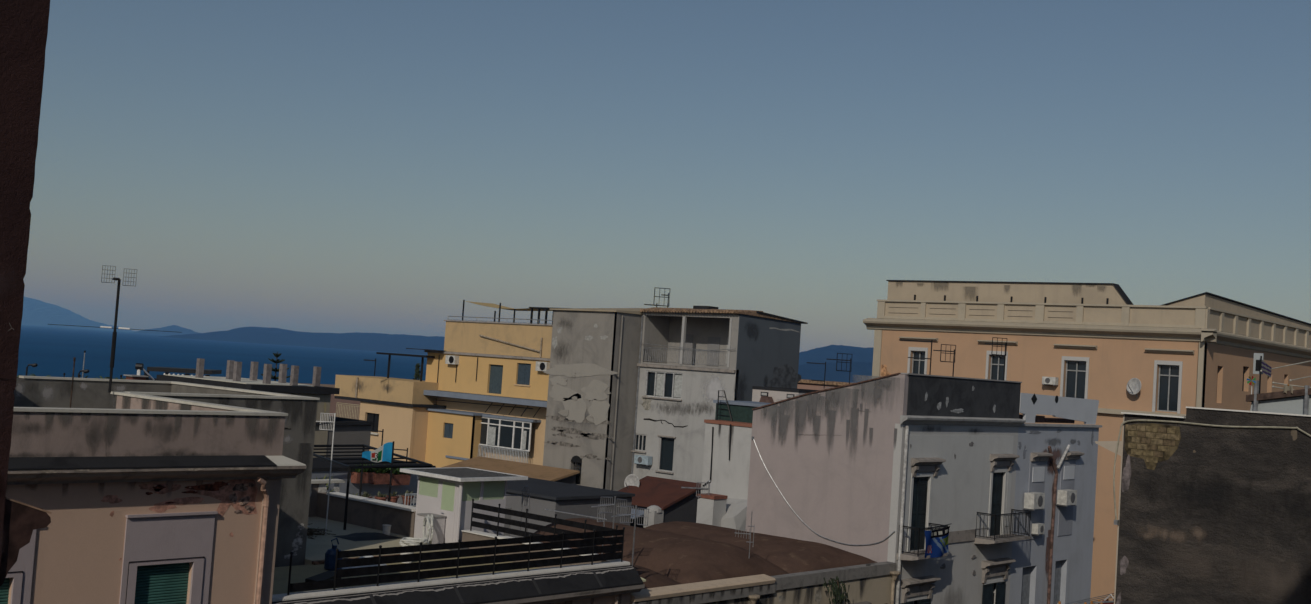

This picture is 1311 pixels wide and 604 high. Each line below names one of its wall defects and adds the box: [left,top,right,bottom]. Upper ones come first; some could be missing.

leakage [42,383,91,425]
leakage [667,377,745,411]
leakage [762,375,895,445]
leakage [107,386,316,501]
peeling [139,479,258,516]
leakage [619,584,822,604]